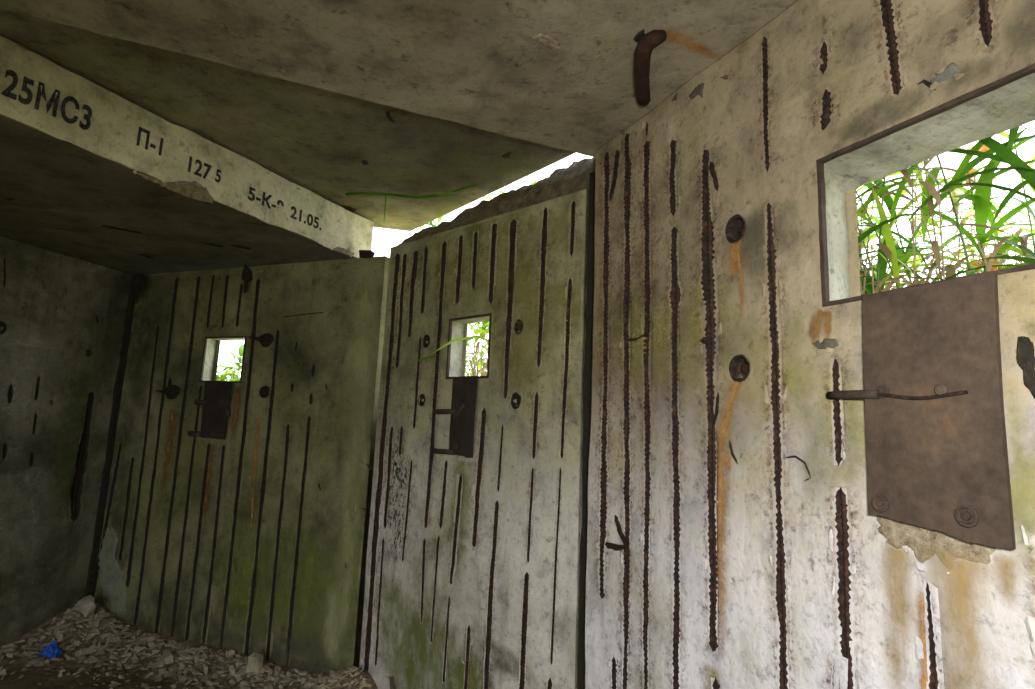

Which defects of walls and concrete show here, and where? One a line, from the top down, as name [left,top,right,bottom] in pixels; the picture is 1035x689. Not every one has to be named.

spalling [131,169,214,204]
spalling [1016,336,1035,399]
corrosion [716,381,739,614]